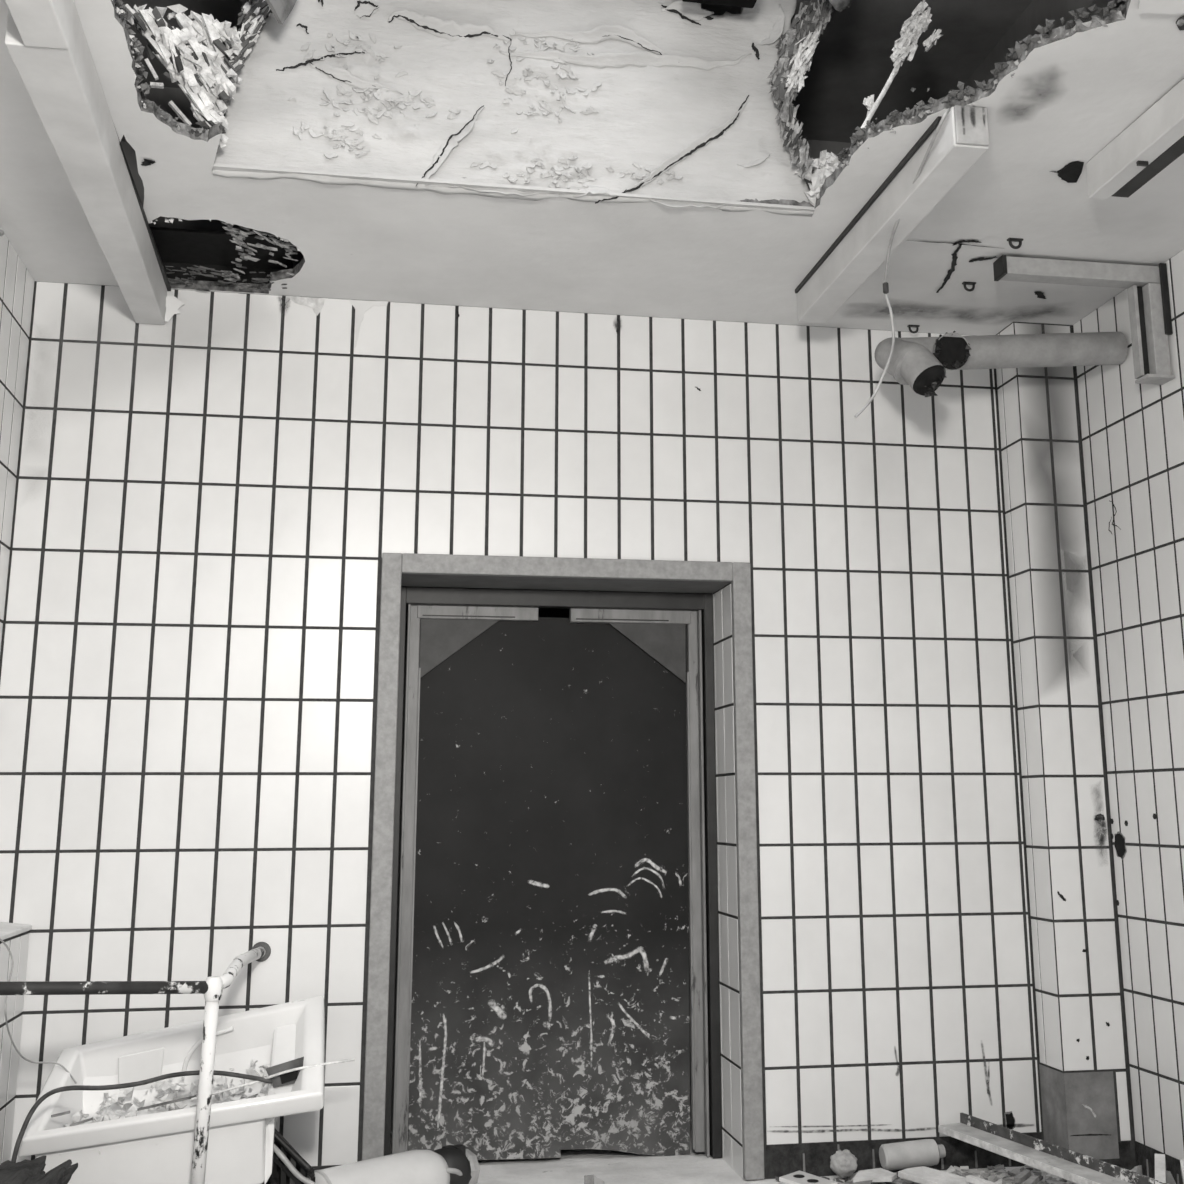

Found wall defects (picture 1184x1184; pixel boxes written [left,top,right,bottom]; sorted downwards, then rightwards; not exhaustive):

flaking render [112,0,272,154]
crack [276,51,403,95]
peeling [293,23,461,159]
crack [415,105,485,187]
crack [595,95,749,204]
flaking render [355,0,1184,207]
flaking render [150,218,300,292]
water stain [1038,367,1080,662]